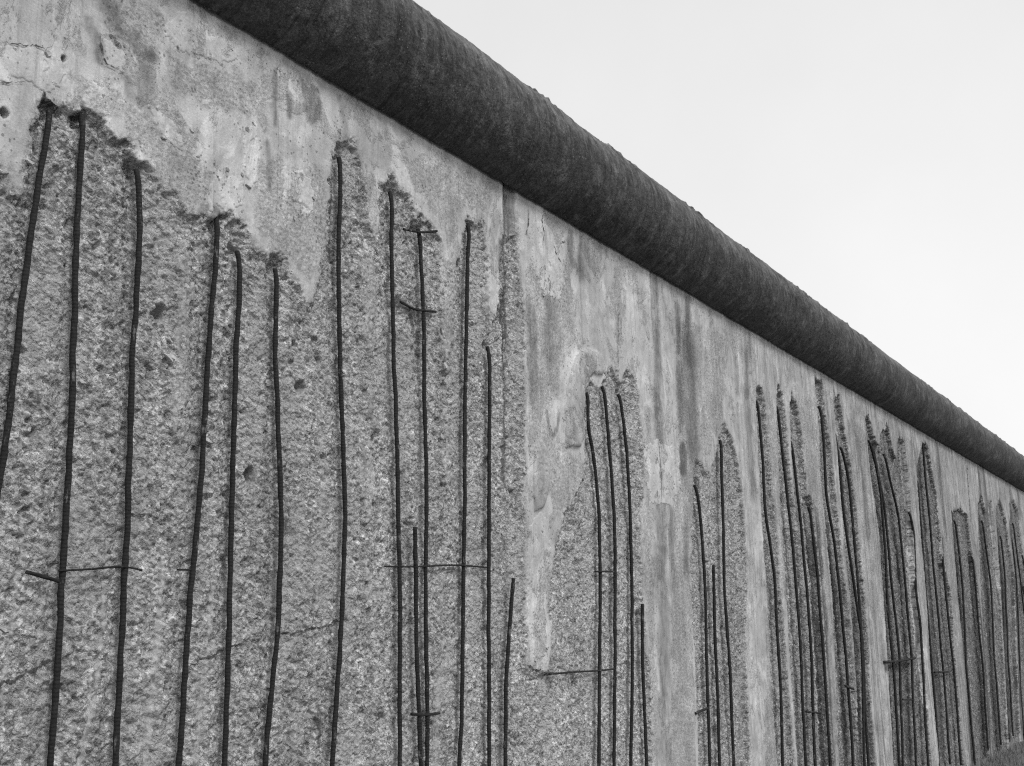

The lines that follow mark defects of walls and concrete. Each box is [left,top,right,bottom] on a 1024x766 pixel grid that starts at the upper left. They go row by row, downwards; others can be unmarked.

spalling [0,43,750,766]
spalling [756,376,874,766]
spalling [865,416,1024,766]